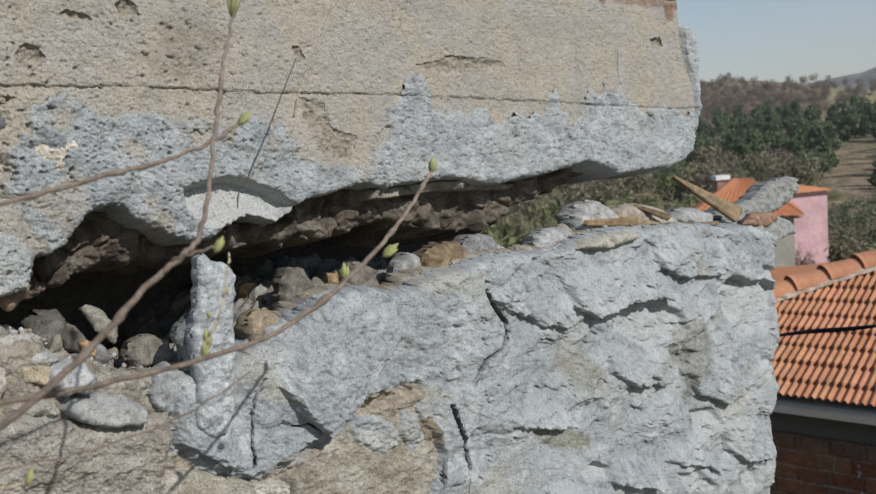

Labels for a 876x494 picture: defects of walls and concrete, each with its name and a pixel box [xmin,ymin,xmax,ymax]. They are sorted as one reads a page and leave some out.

spalling [59,9,92,22]
peeling [0,25,702,312]
spalling [233,307,279,341]
crack [473,283,511,392]
crack [244,370,327,478]
crack [436,399,473,494]